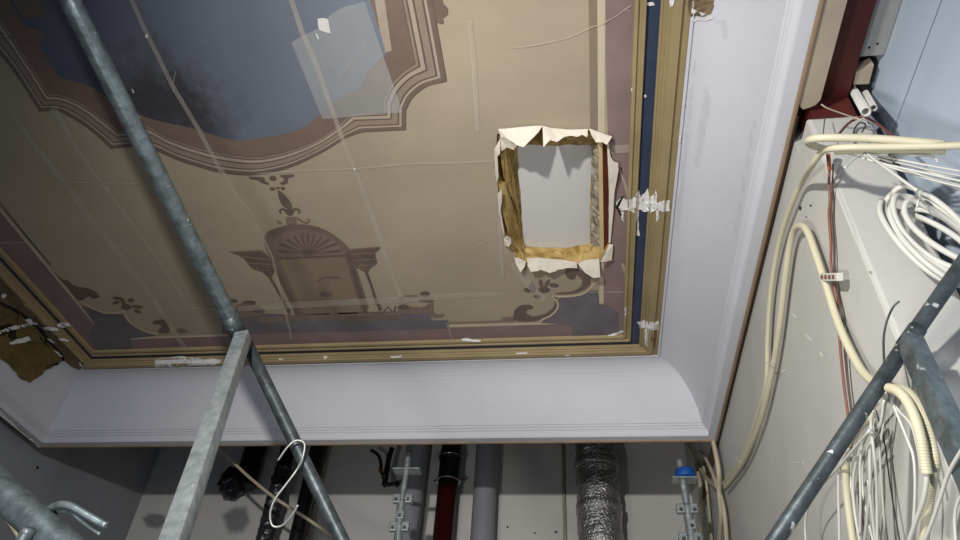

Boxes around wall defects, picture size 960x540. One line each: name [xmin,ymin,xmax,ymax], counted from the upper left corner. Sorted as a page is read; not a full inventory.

spalling [687,0,714,22]
peeling [0,278,84,383]